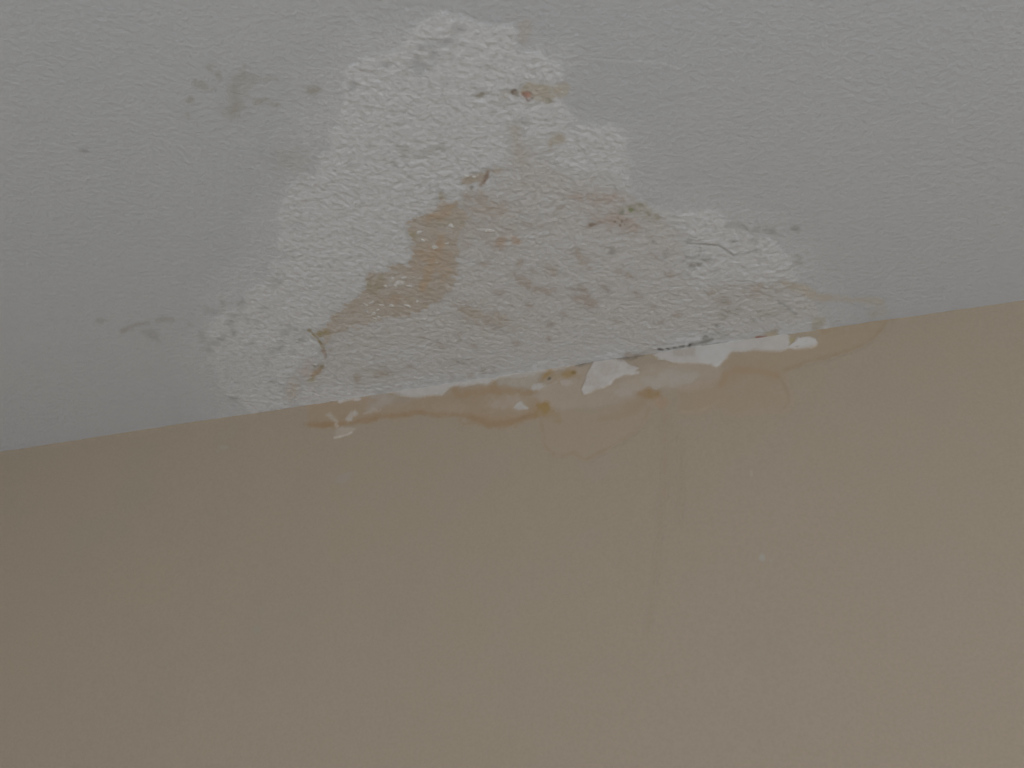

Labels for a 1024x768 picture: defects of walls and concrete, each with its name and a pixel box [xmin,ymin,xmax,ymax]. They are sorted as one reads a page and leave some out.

flaking render [170,4,865,423]
water stain [299,121,899,464]